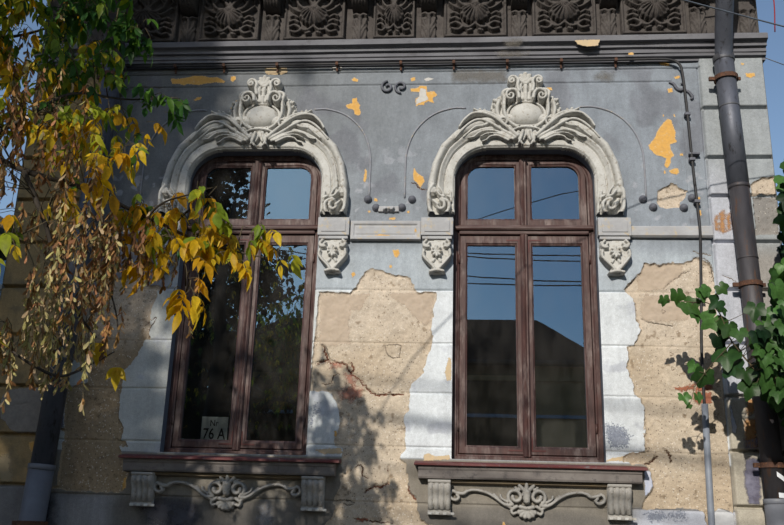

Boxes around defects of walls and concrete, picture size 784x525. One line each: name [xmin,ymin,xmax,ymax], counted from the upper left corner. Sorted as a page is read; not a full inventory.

peeling [575,39,600,47]
peeling [171,76,236,85]
peeling [346,98,361,115]
peeling [410,77,437,106]
peeling [648,114,688,209]
flaking render [750,177,779,236]
flaking render [52,277,161,493]
crack [317,344,404,397]
flaking render [310,249,437,525]
flaking render [606,258,737,525]
peeling [423,453,450,461]
crack [337,464,393,524]